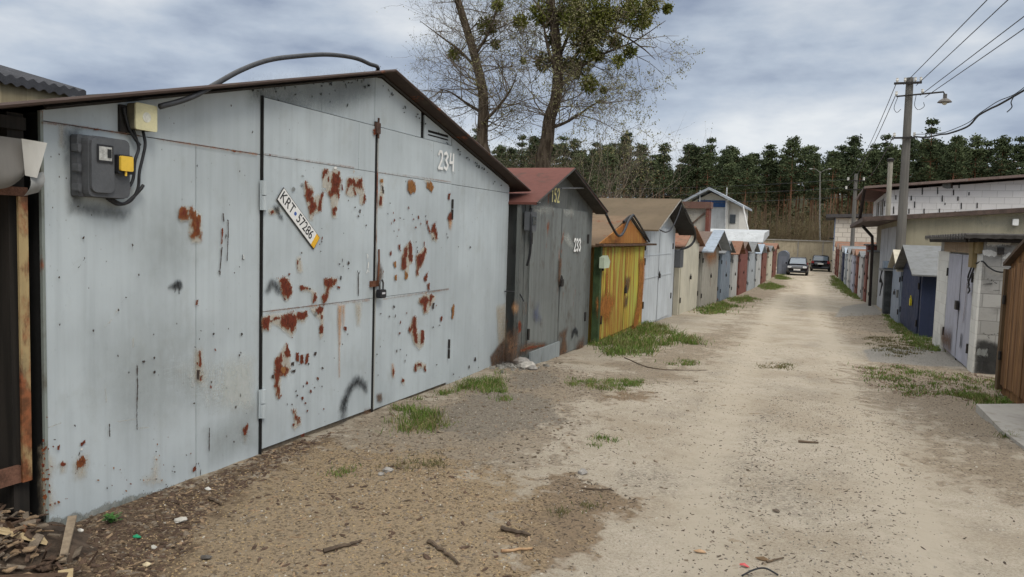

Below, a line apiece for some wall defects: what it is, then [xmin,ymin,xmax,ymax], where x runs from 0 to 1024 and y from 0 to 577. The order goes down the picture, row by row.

corrosion [178,206,203,241]
corrosion [305,167,367,226]
corrosion [405,179,453,227]
corrosion [379,220,455,344]
corrosion [261,277,340,399]
corrosion [491,305,545,366]